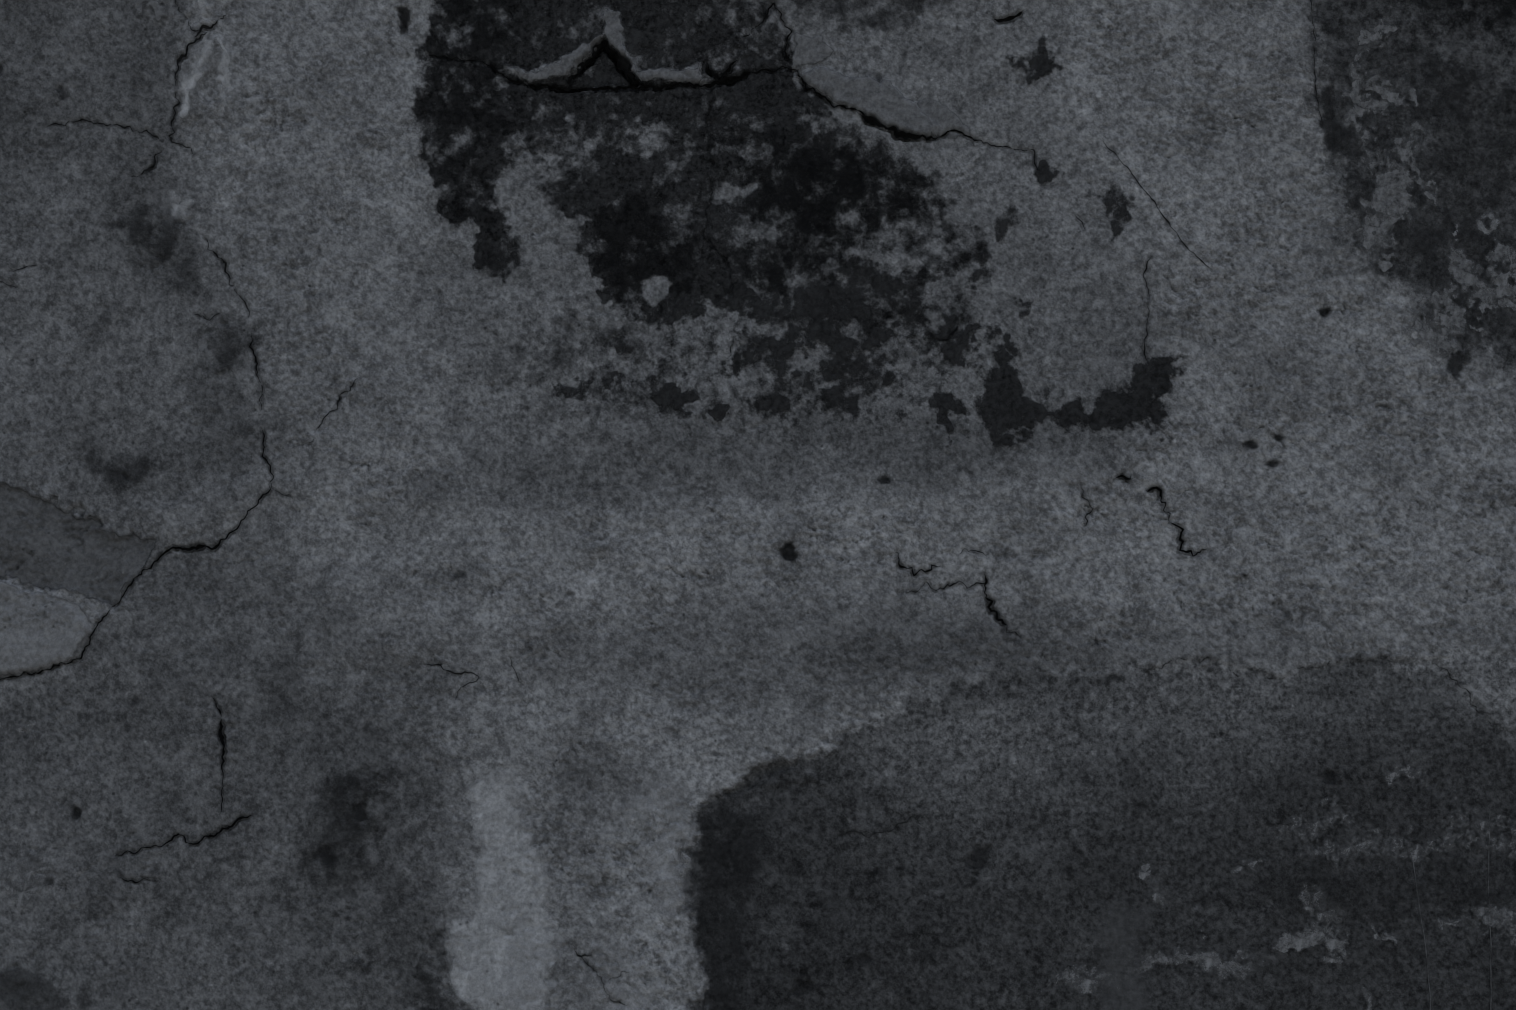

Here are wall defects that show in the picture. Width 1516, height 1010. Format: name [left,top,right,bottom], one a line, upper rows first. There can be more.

crack [47,0,226,177]
water stain [412,0,988,365]
crack [429,0,1038,294]
water stain [1319,74,1509,215]
crack [0,236,293,680]
water stain [1448,348,1471,378]
crack [115,698,251,884]
water stain [417,775,556,1010]